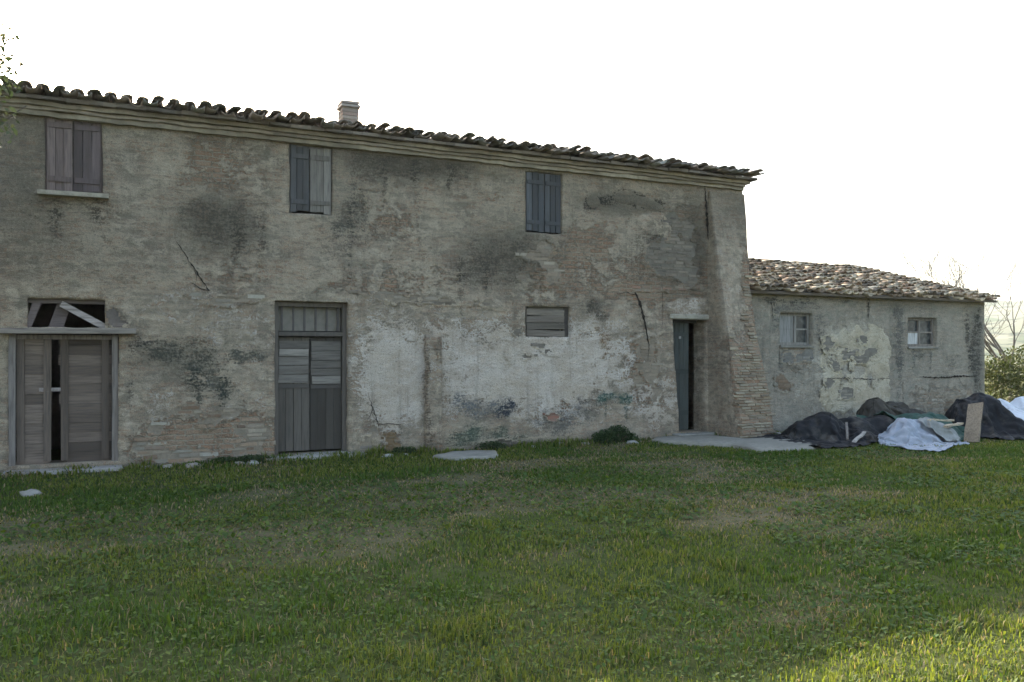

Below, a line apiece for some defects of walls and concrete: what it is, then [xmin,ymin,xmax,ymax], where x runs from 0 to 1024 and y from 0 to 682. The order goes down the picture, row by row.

crack [702,186,710,237]
crack [177,243,210,291]
spalling [638,194,704,295]
water stain [228,349,268,364]
crack [617,292,663,355]
flaking render [627,325,668,418]
spalling [729,275,795,438]
flaking render [819,324,892,417]
crack [923,375,973,384]
water stain [965,309,982,393]
spalling [131,413,276,466]
spalling [352,414,401,452]